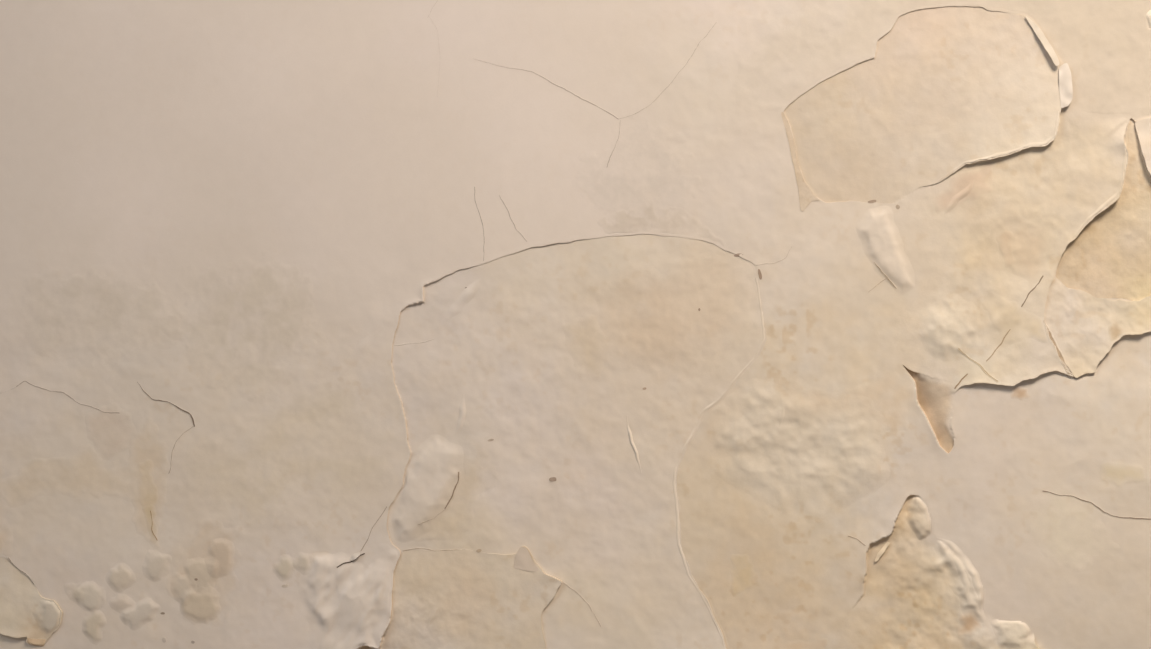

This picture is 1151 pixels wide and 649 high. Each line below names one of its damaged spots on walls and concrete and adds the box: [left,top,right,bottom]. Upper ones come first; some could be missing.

crack [475,22,717,168]
crack [474,187,527,261]
peeling [781,6,1151,392]
crack [2,380,119,413]
crack [137,382,195,474]
crack [402,472,465,551]
crack [1043,490,1151,520]
peeling [0,557,63,647]
peeling [361,546,562,649]
peeling [828,495,1040,649]